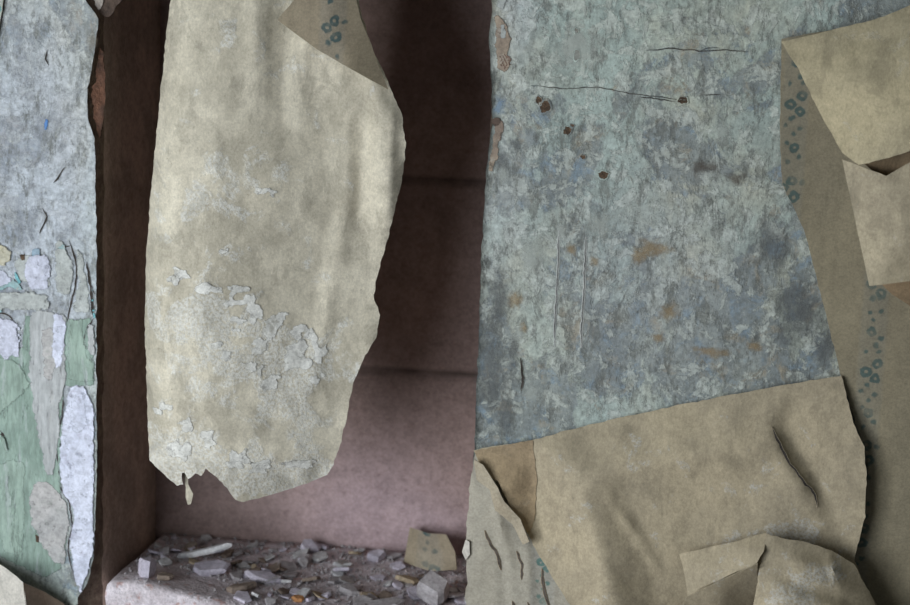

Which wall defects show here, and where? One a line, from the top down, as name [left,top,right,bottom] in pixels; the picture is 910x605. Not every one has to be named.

spalling [94,0,122,17]
spalling [91,47,106,138]
peeling [0,240,95,592]
peeling [462,540,470,566]